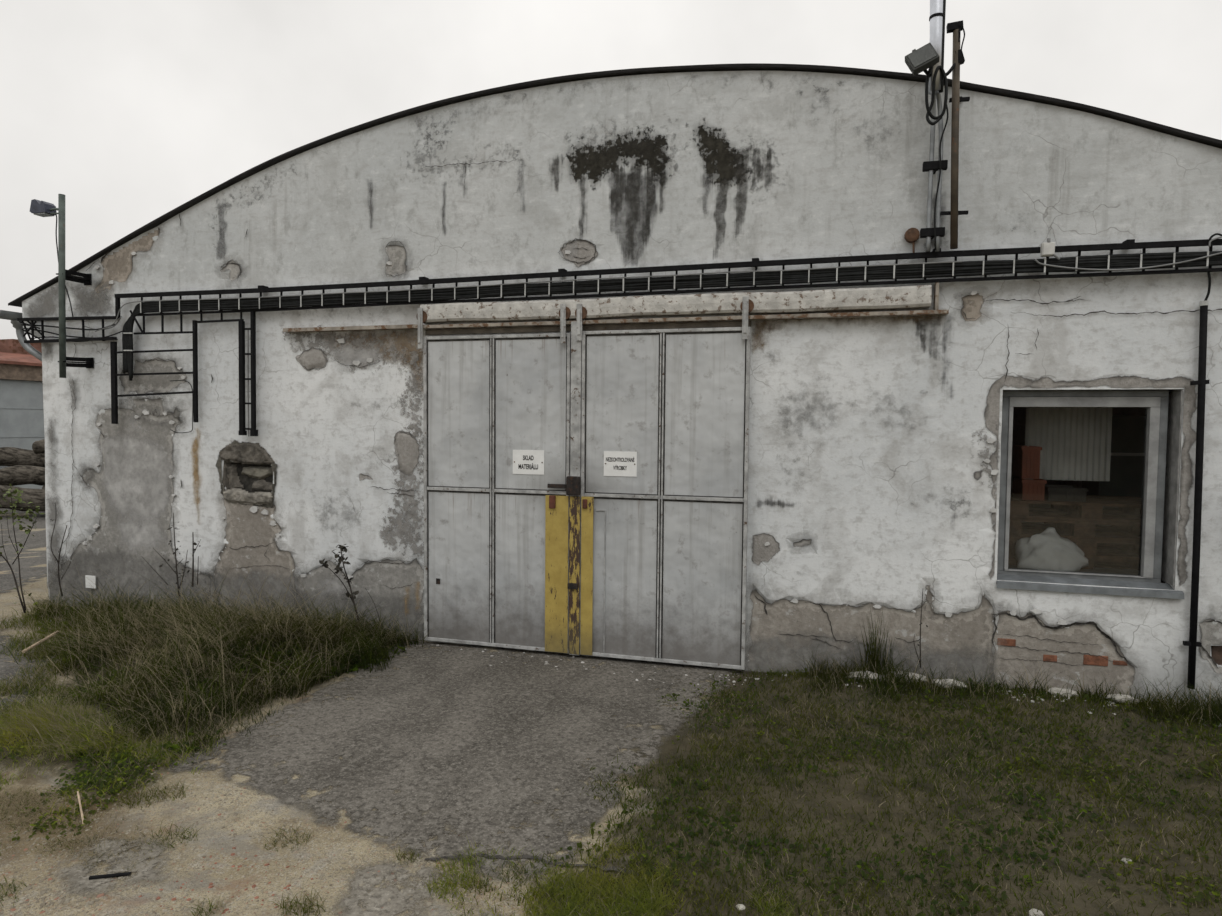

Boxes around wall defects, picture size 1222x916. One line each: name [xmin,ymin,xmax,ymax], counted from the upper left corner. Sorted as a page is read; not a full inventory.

water stain [552,127,671,260]
water stain [693,118,772,247]
flaking render [27,227,160,318]
flaking render [48,328,424,640]
flaking render [974,375,1197,586]
flaking render [752,533,812,565]
flaking render [747,585,1135,696]
flaking render [1199,619,1222,674]